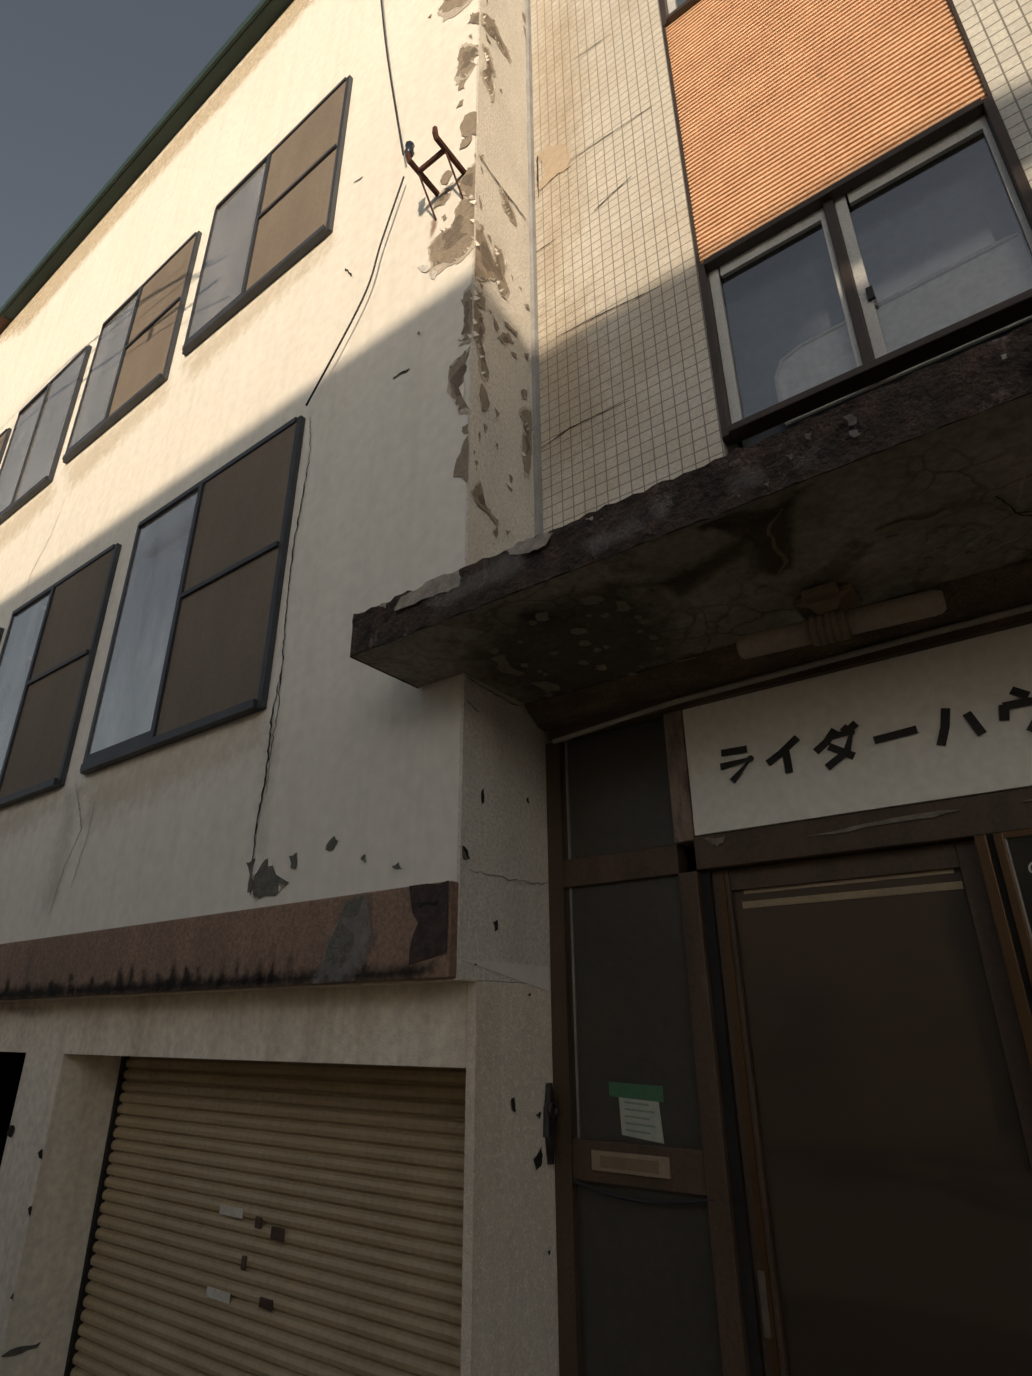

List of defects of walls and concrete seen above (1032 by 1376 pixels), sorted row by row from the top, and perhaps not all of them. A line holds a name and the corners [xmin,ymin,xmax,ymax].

peeling [417,0,553,555]
water stain [844,414,860,438]
water stain [662,490,801,595]
peeling [379,570,461,611]
water stain [468,584,665,700]
spalling [325,836,338,851]
spalling [246,853,297,900]
spalling [408,880,449,979]
water stain [0,965,430,999]